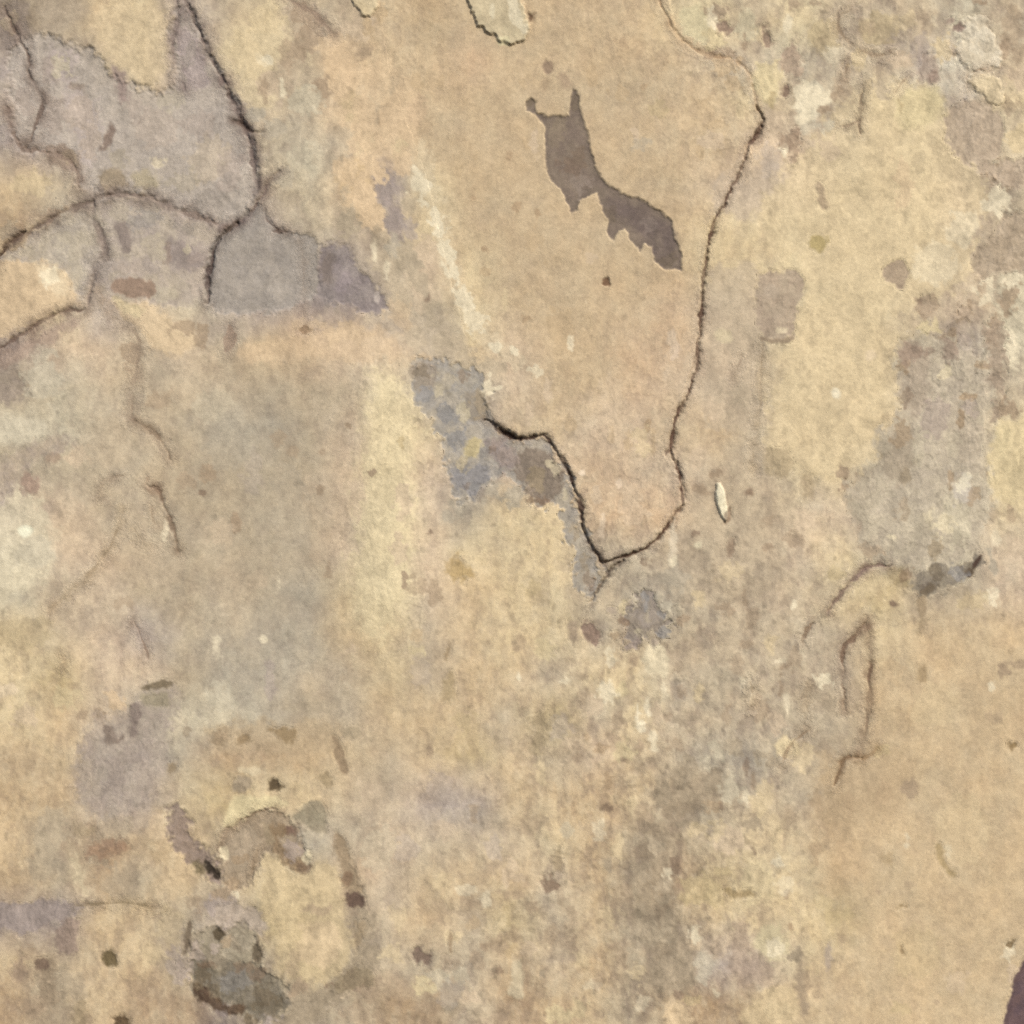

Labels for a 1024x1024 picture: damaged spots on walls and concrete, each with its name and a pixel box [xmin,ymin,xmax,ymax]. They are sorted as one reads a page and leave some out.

crack [0,0,322,621]
crack [477,0,772,614]
crack [742,671,762,719]
crack [772,554,900,795]